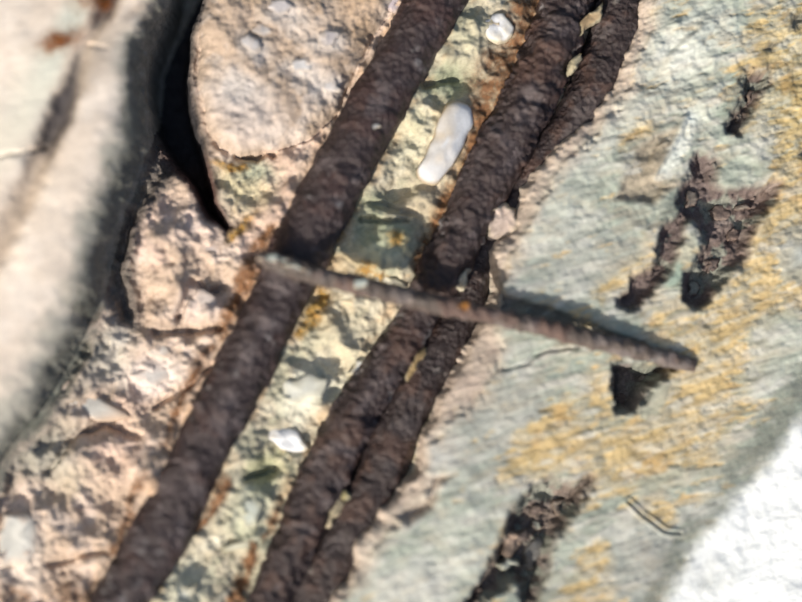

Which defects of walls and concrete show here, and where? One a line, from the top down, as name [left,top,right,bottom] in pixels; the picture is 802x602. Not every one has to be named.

rust [44,34,71,51]